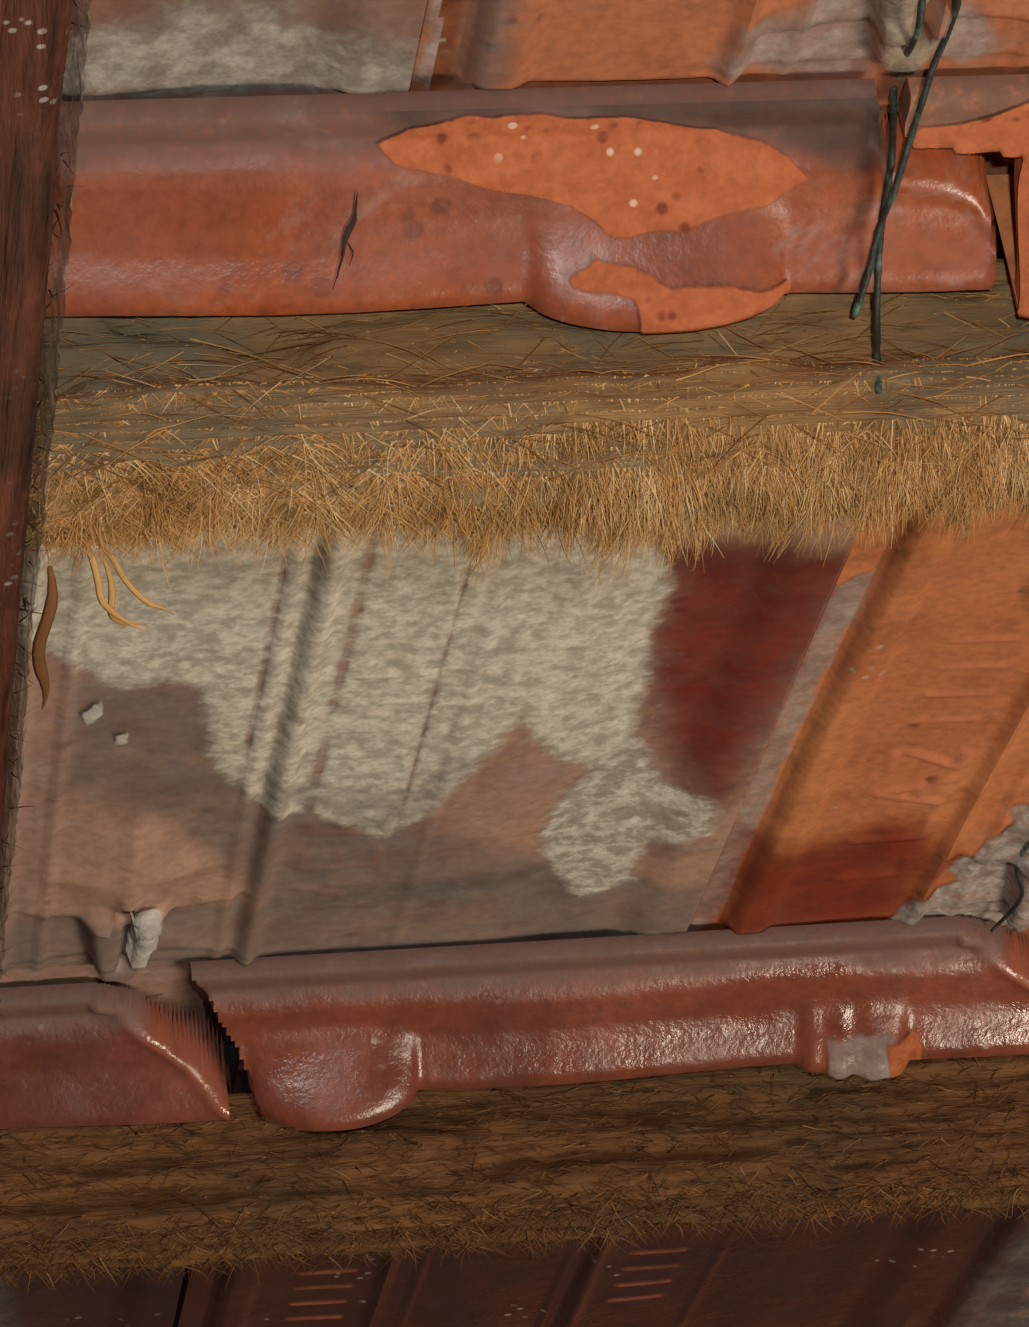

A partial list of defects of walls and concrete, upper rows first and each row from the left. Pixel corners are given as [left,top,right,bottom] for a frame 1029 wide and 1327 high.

spalling [378,114,808,239]
spalling [912,103,1029,319]
spalling [569,259,791,334]
water stain [0,0,1029,955]
water stain [110,909,164,968]